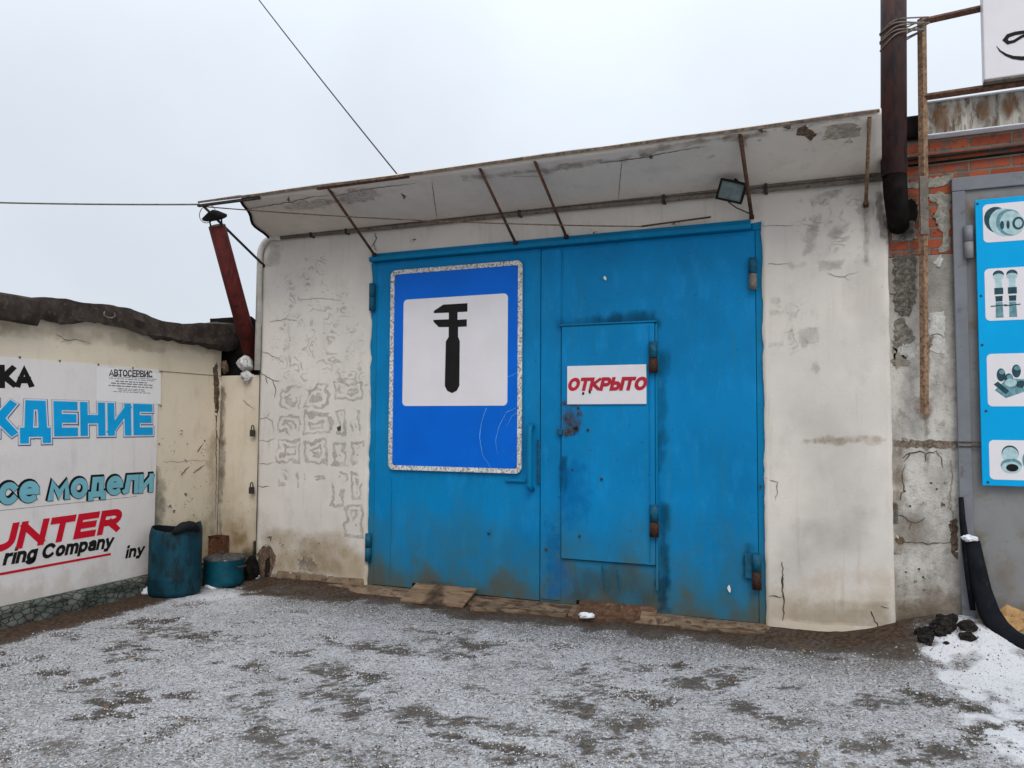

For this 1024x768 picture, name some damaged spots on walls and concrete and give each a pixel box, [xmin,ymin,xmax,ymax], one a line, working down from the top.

peeling [783,123,861,144]
spalling [908,198,918,224]
spalling [889,252,946,368]
crack [243,351,283,487]
corrosion [562,401,581,436]
crack [899,451,954,545]
spalling [947,518,959,560]
crack [772,563,785,621]